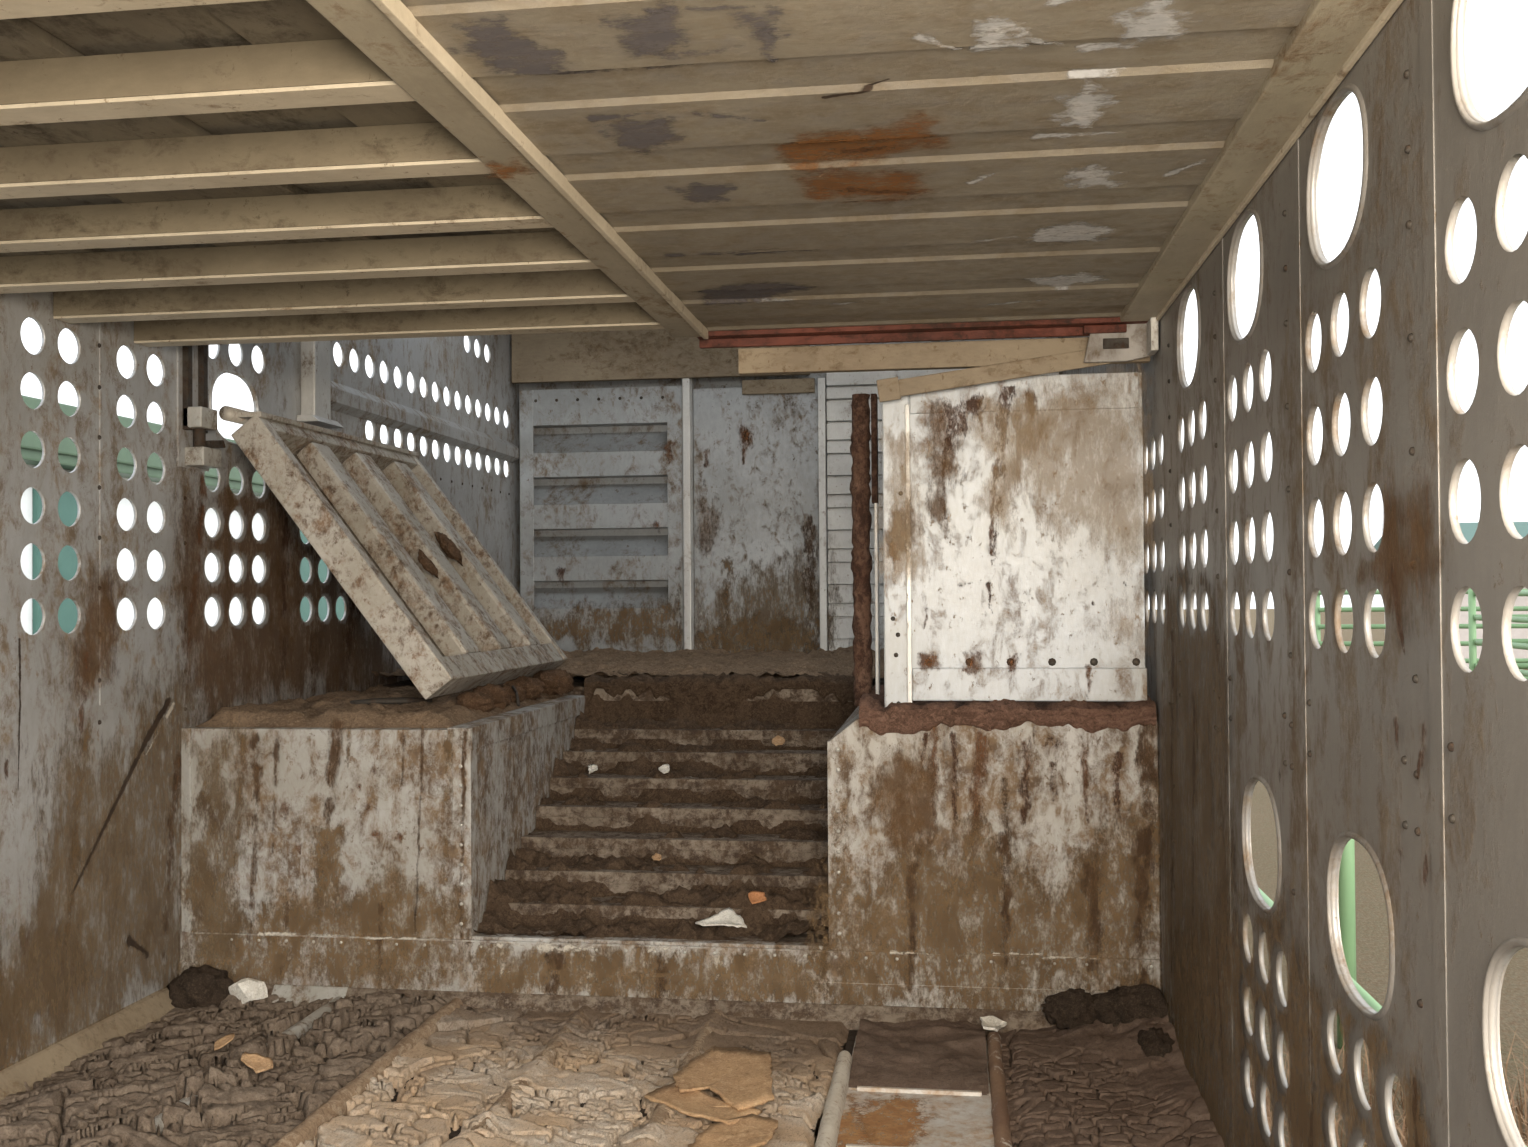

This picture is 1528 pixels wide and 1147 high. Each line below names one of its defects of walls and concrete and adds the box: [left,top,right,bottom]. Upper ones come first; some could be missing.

corrosion [777,113,945,202]
corrosion [885,386,1037,605]
damp [721,558,733,619]
damp [803,516,816,626]
corrosion [918,653,939,670]
corrosion [963,652,981,675]
damp [167,754,182,889]
damp [415,725,425,921]
damp [441,729,467,924]
corrosion [869,726,1059,865]
corrosion [1112,724,1159,873]
corrosion [836,1095,934,1147]